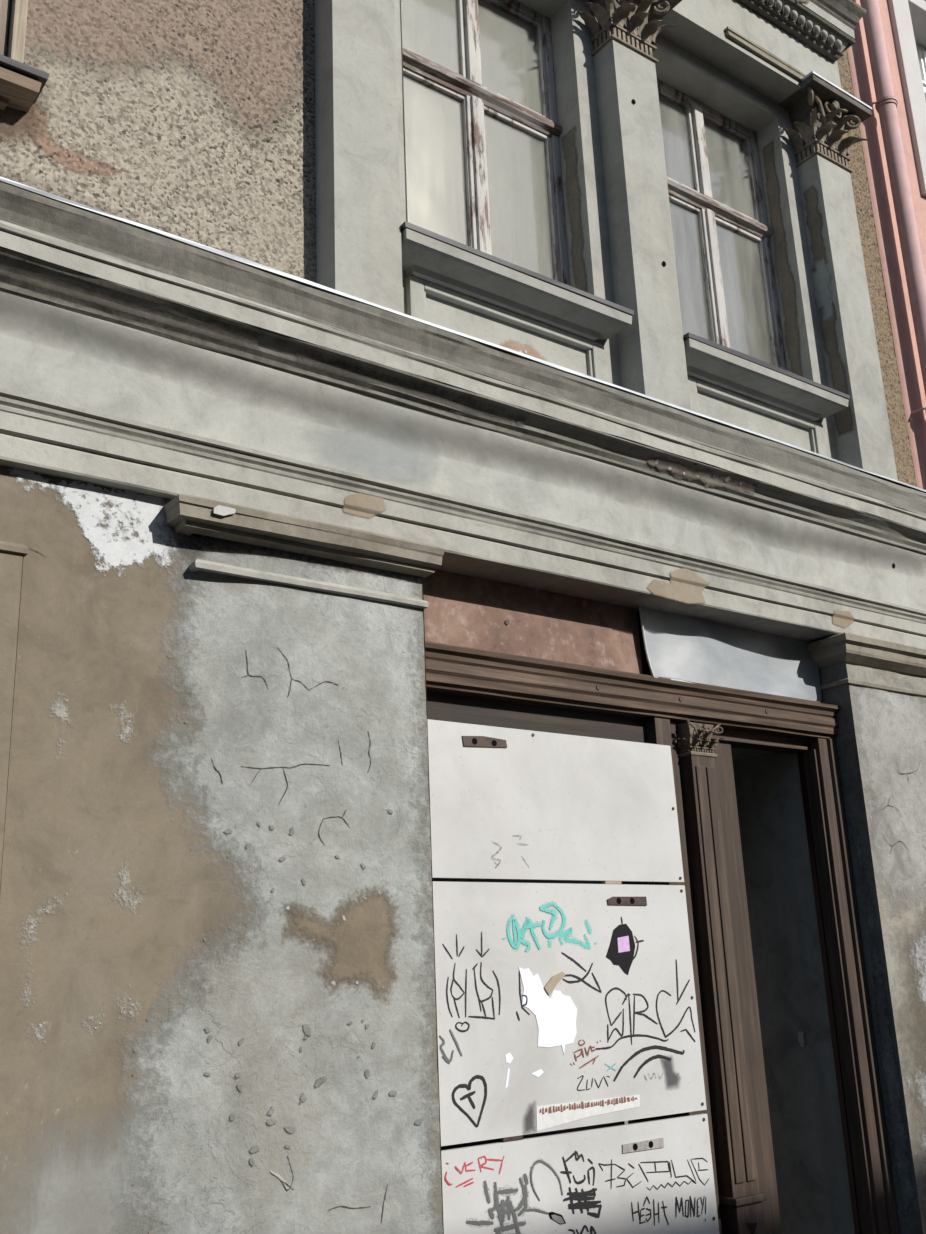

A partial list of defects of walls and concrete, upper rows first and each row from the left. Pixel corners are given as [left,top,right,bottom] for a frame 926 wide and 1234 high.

flaking render [804,186,827,271]
flaking render [819,303,853,435]
crack [241,648,339,696]
crack [211,731,371,804]
flaking render [8,468,443,1234]